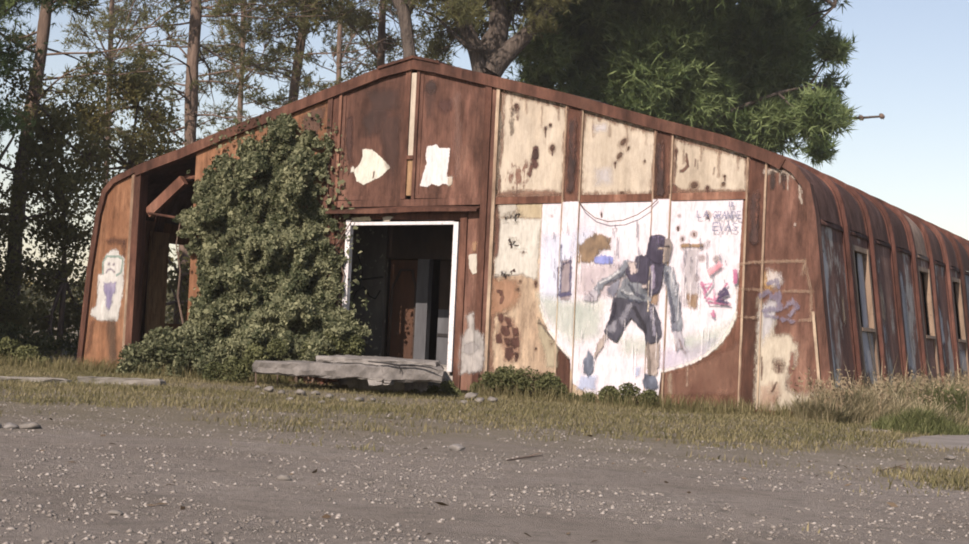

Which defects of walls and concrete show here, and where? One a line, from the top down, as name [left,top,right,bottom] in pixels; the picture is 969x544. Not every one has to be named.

corrosion [488,90,760,373]
corrosion [108,321,116,362]
peeling [755,301,815,411]
peeling [823,253,840,387]
peeling [862,327,876,375]